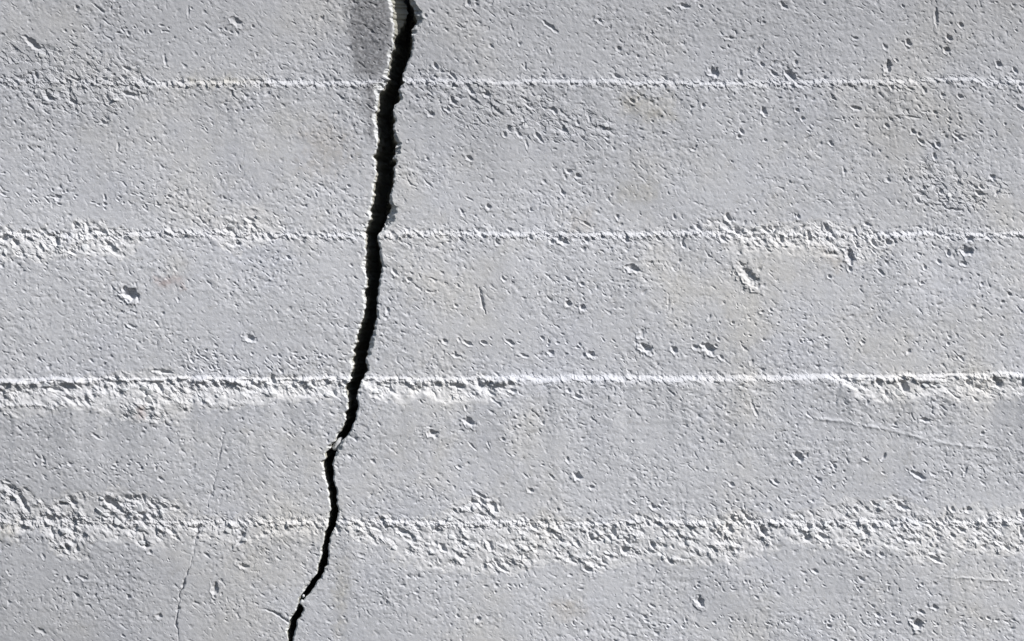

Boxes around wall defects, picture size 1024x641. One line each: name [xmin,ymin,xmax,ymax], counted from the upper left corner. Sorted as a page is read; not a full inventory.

crack [257,0,425,641]